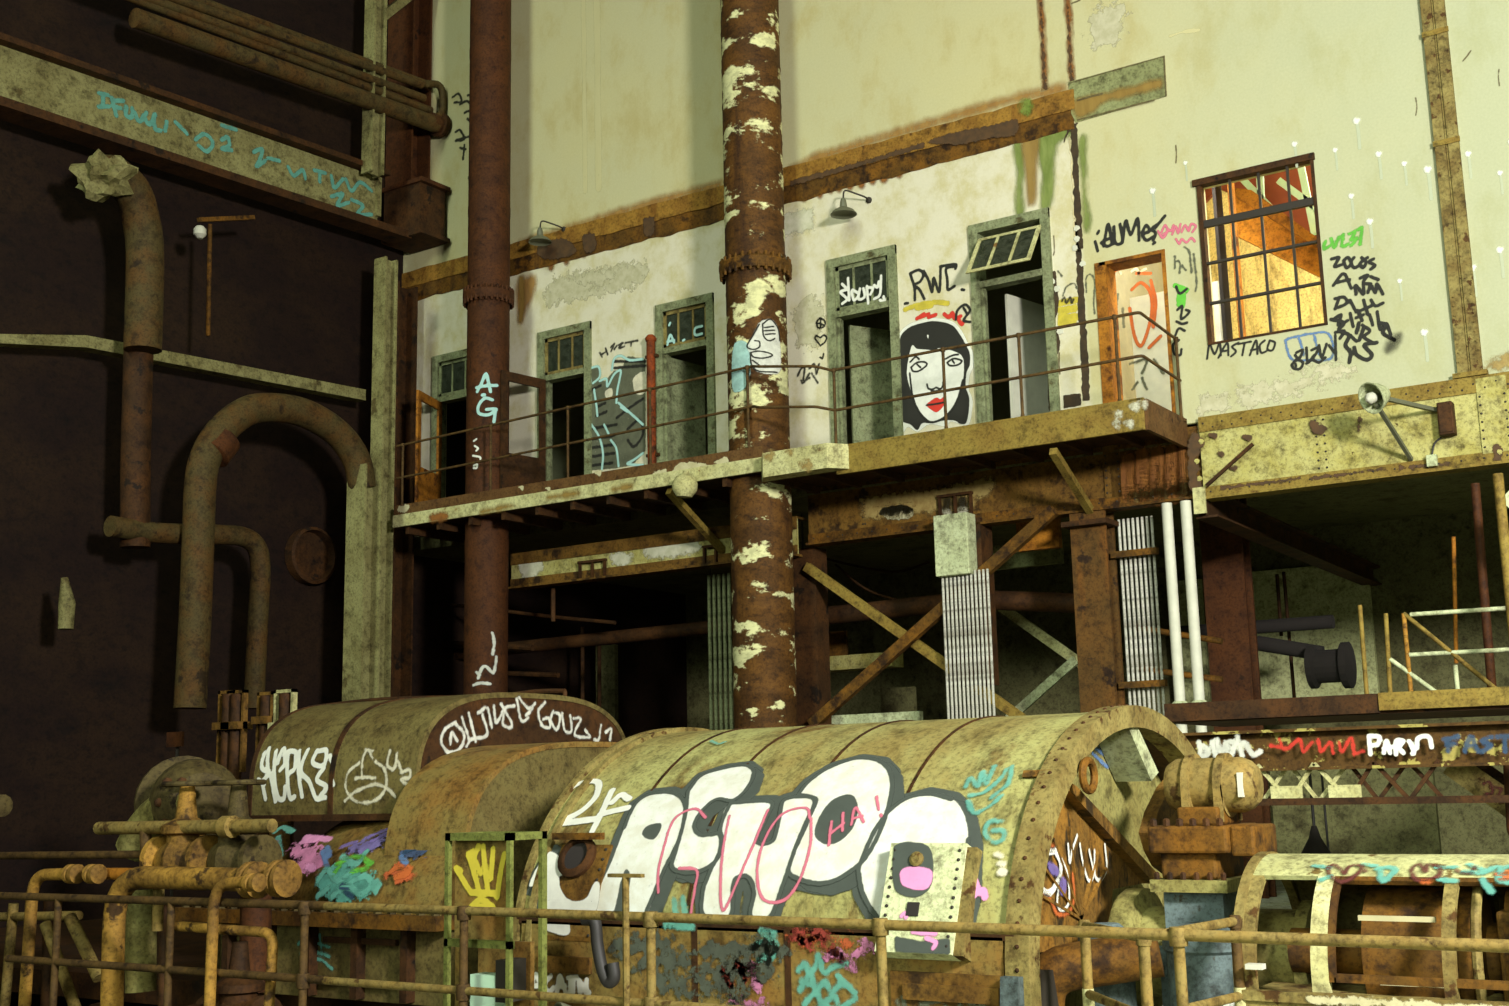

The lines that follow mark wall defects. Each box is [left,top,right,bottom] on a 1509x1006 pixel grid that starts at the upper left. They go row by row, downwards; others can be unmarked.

rust [790,0,1075,198]
water stain [1014,80,1162,214]
peeling [542,257,649,309]
rust [531,182,721,271]